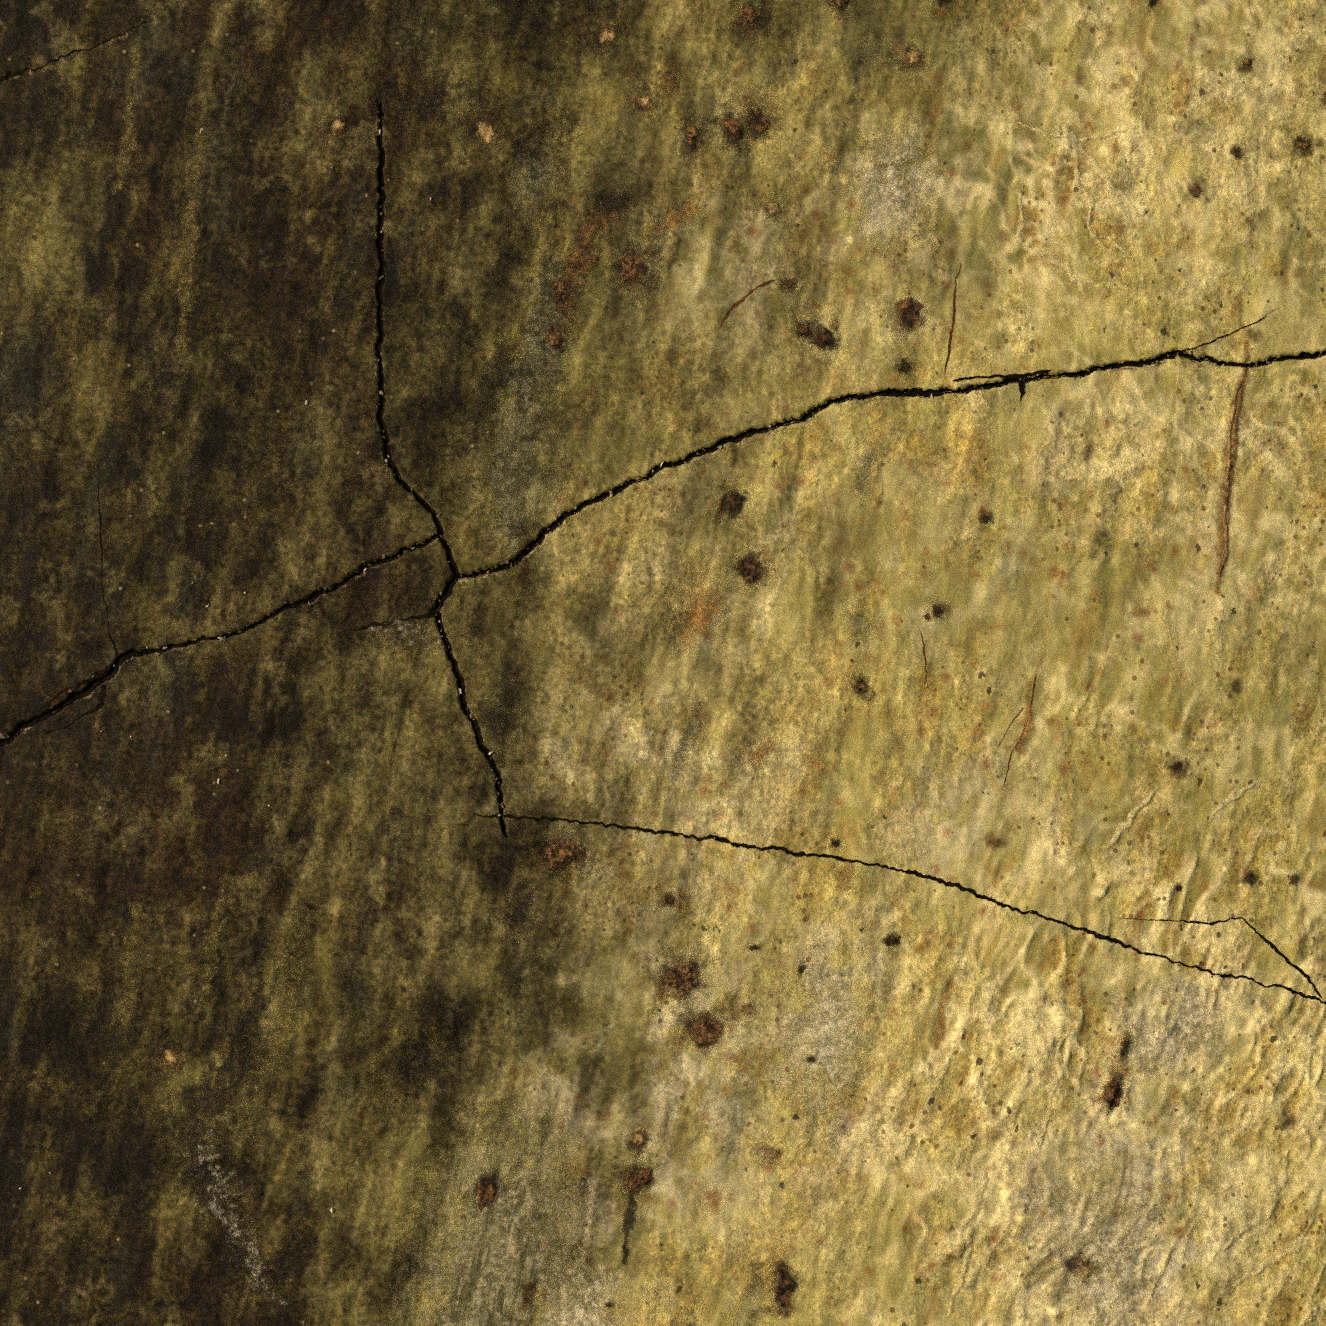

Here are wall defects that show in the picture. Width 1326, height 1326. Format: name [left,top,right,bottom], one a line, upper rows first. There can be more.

corrosion [683,126,704,150]
corrosion [713,98,772,151]
corrosion [1215,330,1258,593]
crack [0,104,1326,1005]
corrosion [734,553,763,582]
water stain [0,0,809,1326]
corrosion [663,961,705,999]
corrosion [685,999,748,1053]
corrosion [622,1131,653,1264]